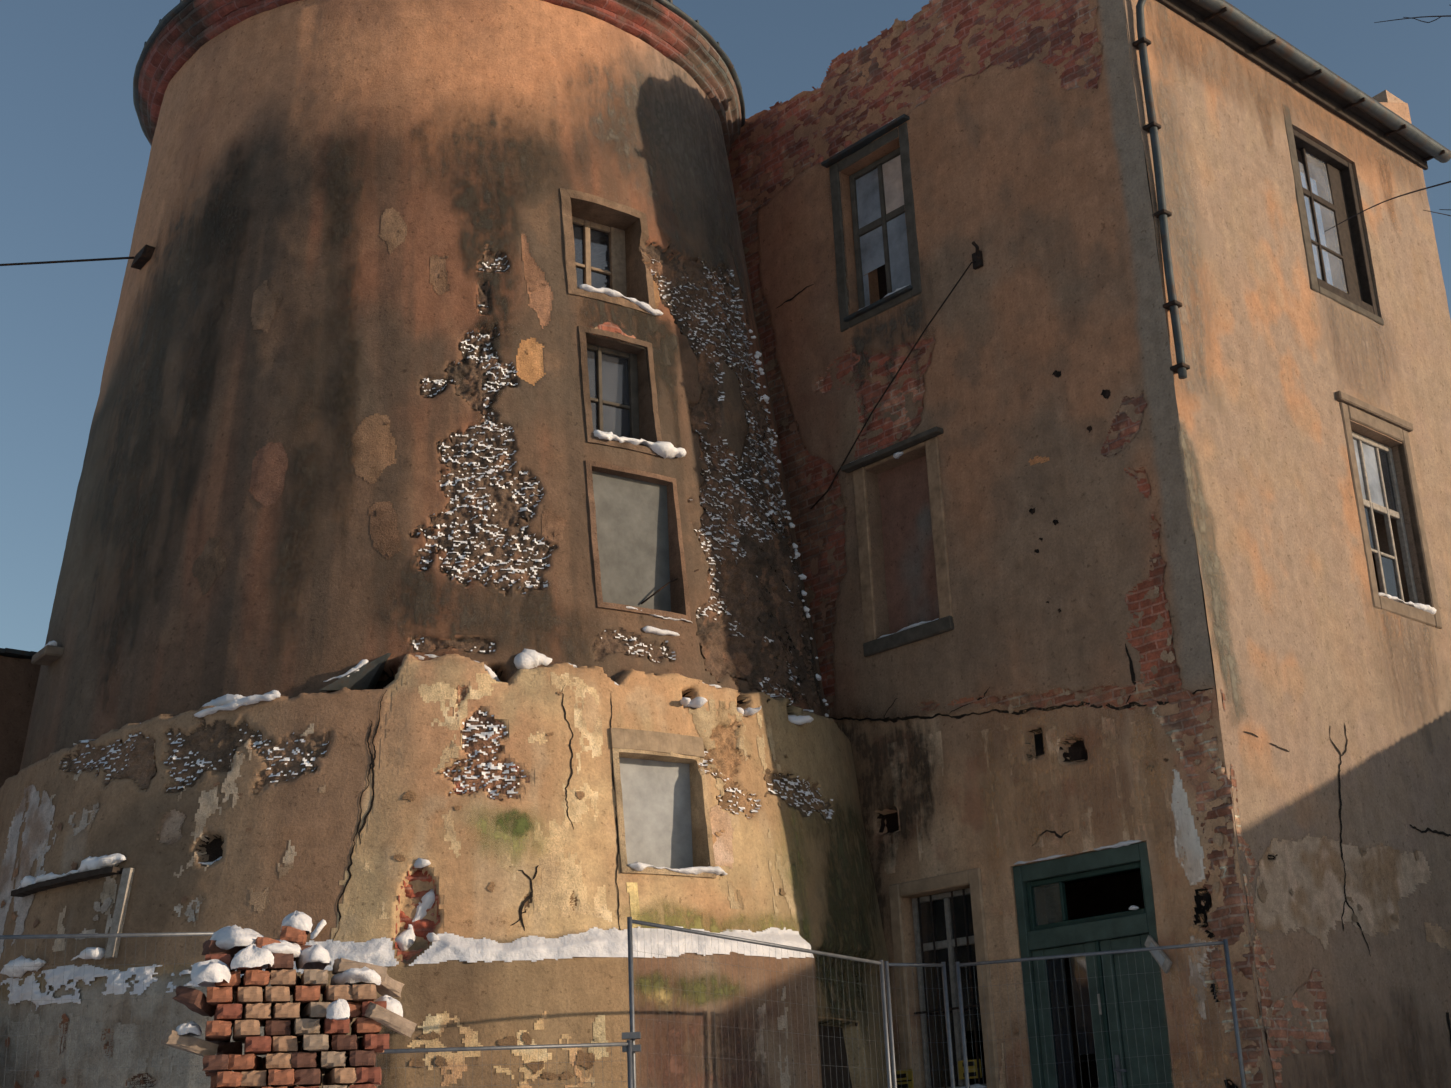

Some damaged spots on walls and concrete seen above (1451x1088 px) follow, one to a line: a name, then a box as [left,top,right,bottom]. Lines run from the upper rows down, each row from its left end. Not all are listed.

spalling [412,234,567,595]
damp [581,298,680,437]
spalling [639,0,1102,923]
peeling [0,785,99,958]
spalling [59,719,332,878]
crack [332,690,387,942]
spalling [379,854,440,965]
spalling [418,671,530,858]
crack [510,865,539,931]
peeling [486,672,612,922]
peeling [1087,389,1432,1088]
crack [1330,723,1371,956]